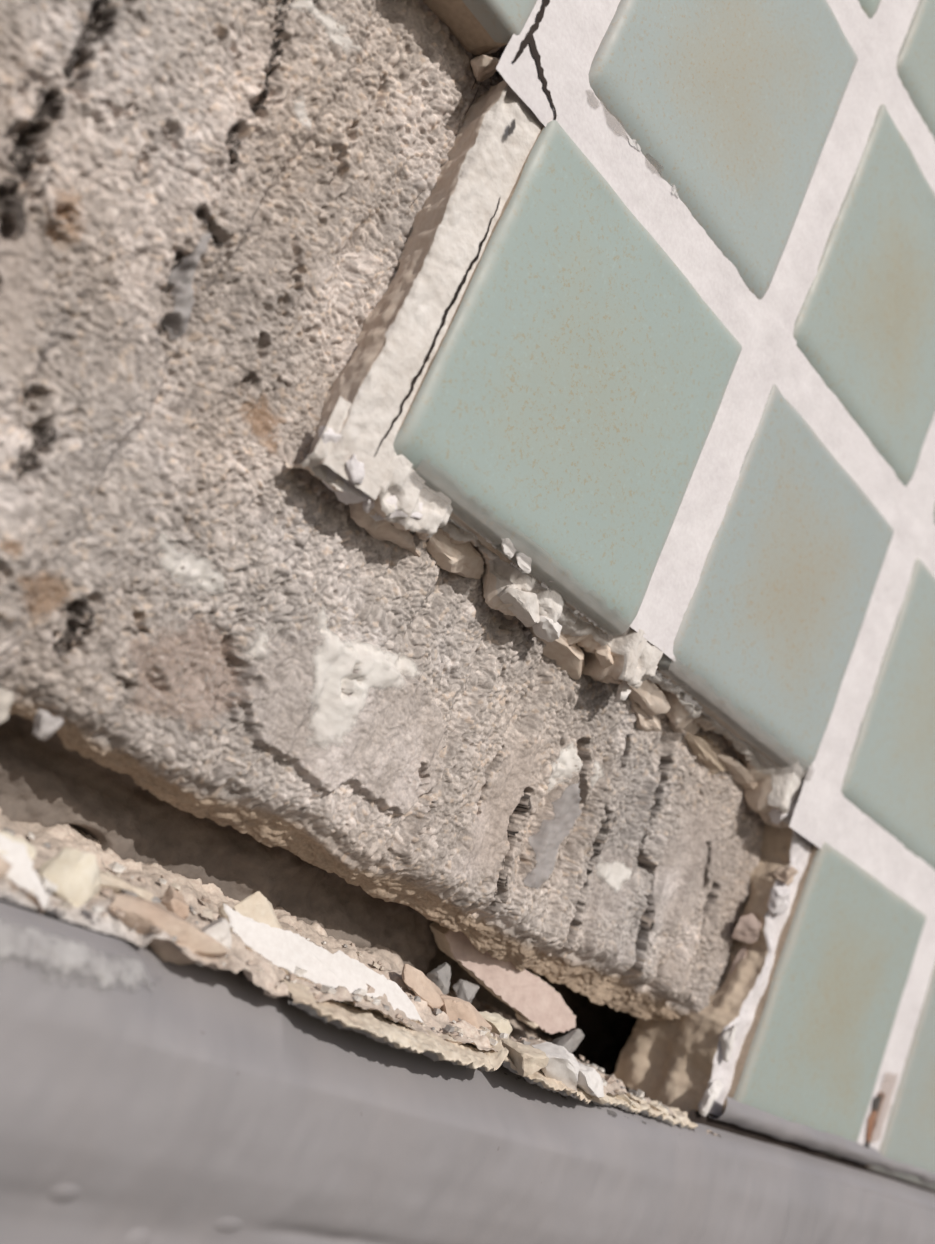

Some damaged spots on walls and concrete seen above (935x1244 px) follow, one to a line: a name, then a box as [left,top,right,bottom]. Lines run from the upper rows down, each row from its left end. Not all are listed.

crack [513,0,557,120]
spalling [0,0,813,1136]
corrosion [866,1092,885,1148]